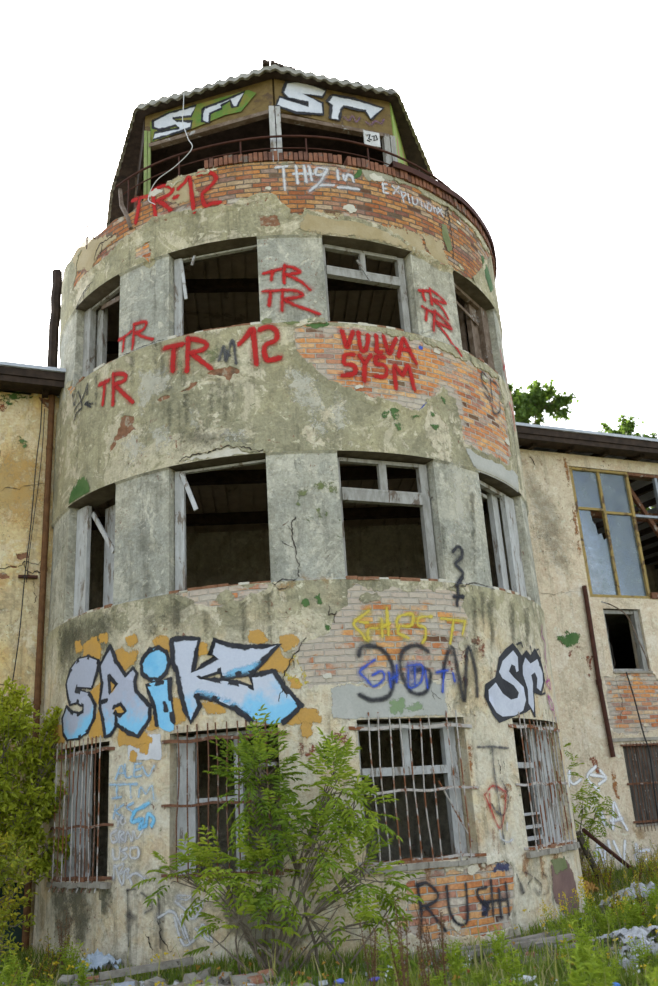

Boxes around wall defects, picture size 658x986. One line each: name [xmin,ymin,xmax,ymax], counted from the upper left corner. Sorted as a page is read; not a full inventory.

flaking render [71,162,493,298]
flaking render [261,317,519,492]
crack [272,517,300,590]
flaking render [284,581,474,721]
flaking render [600,668,658,738]
flaking render [386,850,519,952]